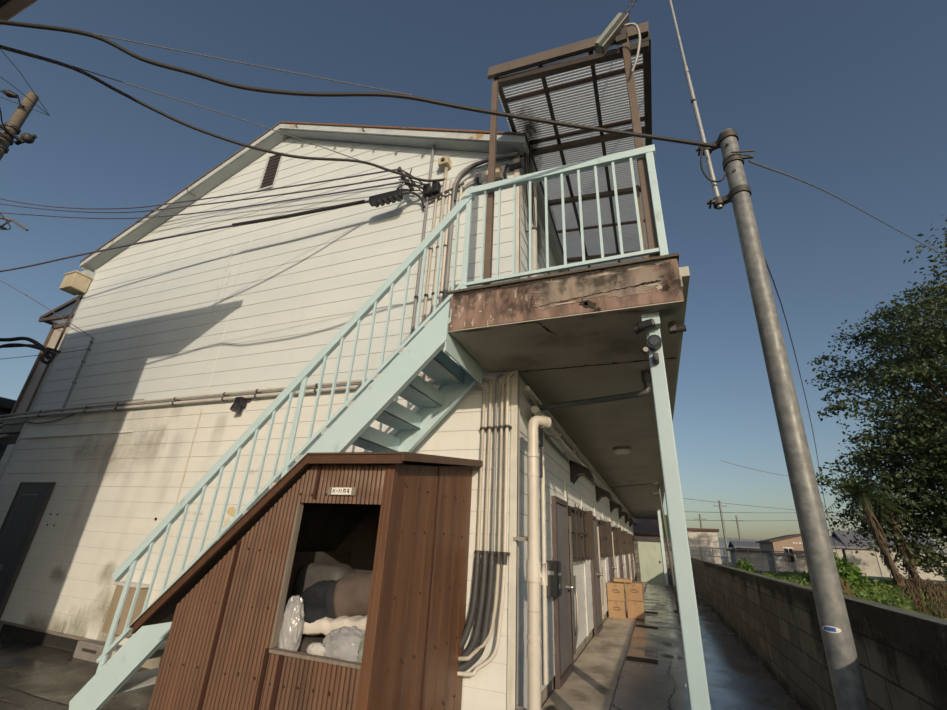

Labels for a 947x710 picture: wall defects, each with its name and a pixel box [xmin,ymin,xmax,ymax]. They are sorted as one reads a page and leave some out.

peeling [450,295,494,327]
peeling [514,261,669,311]